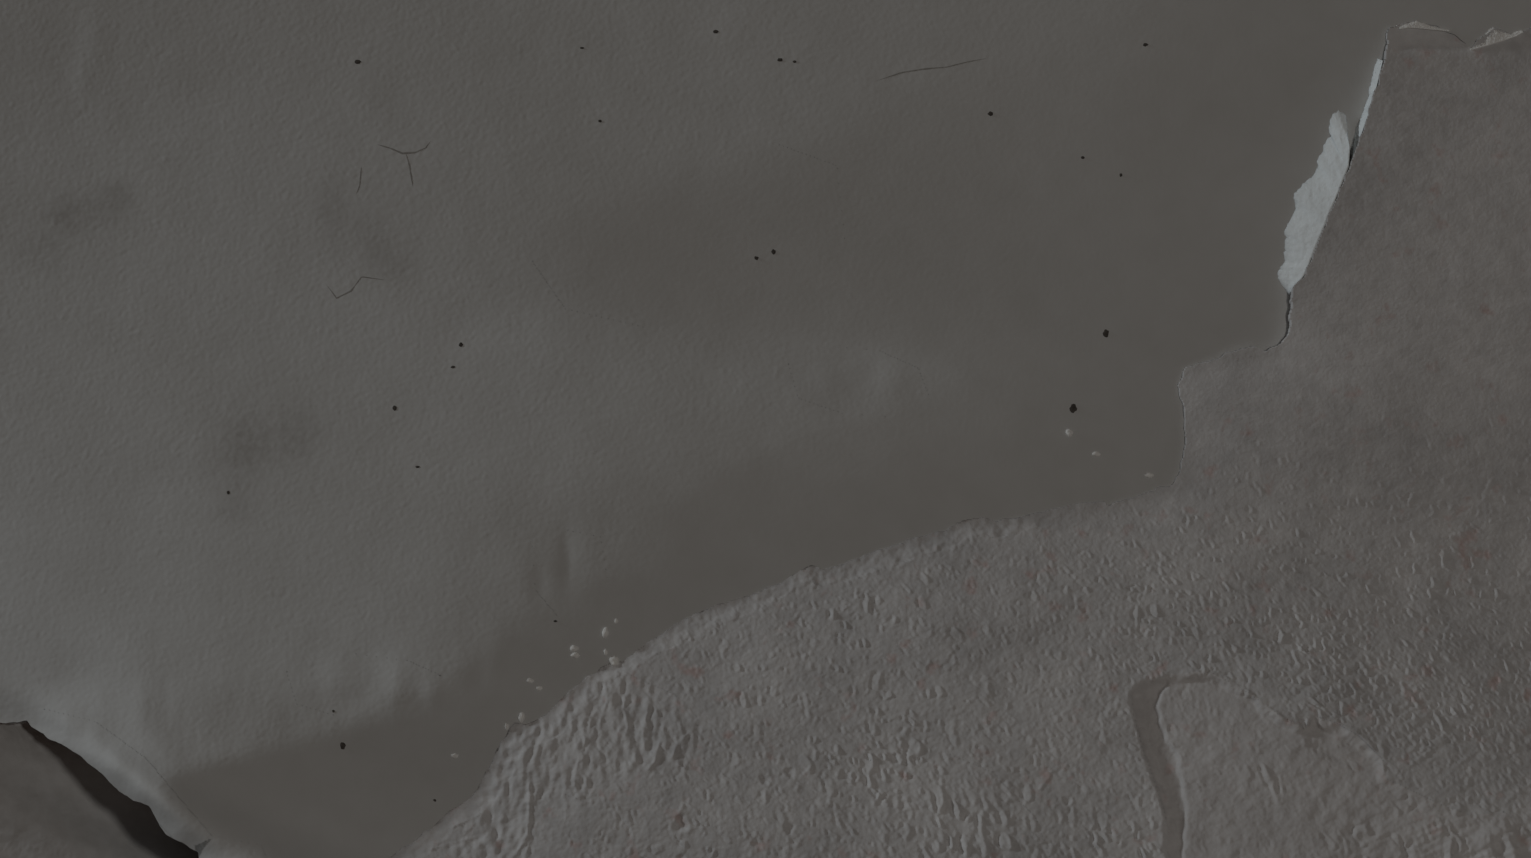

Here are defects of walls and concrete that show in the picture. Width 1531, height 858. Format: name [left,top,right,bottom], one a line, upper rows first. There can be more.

peeling [1469,30,1523,50]
peeling [1352,59,1383,155]
spalling [0,710,212,858]
spalling [470,667,698,858]
peeling [199,836,267,858]